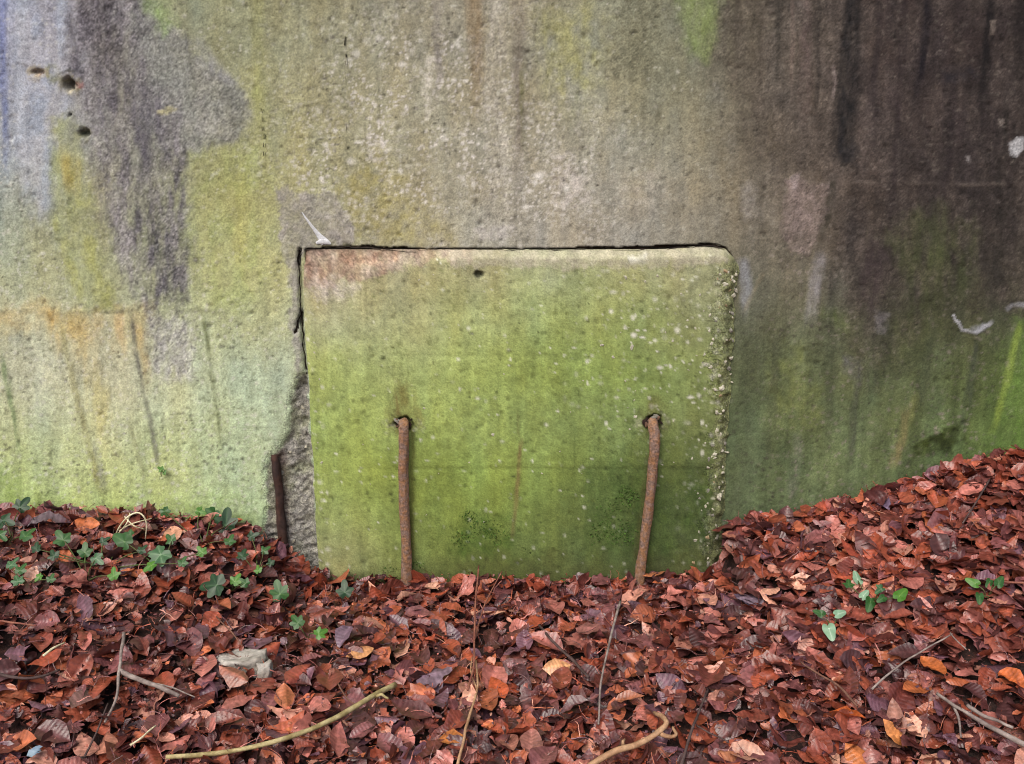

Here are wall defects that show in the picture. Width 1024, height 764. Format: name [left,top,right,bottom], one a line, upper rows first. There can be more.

water stain [0,0,272,497]
water stain [447,0,1024,533]
rust [379,374,430,562]
water stain [332,496,710,591]
rust [632,385,672,565]